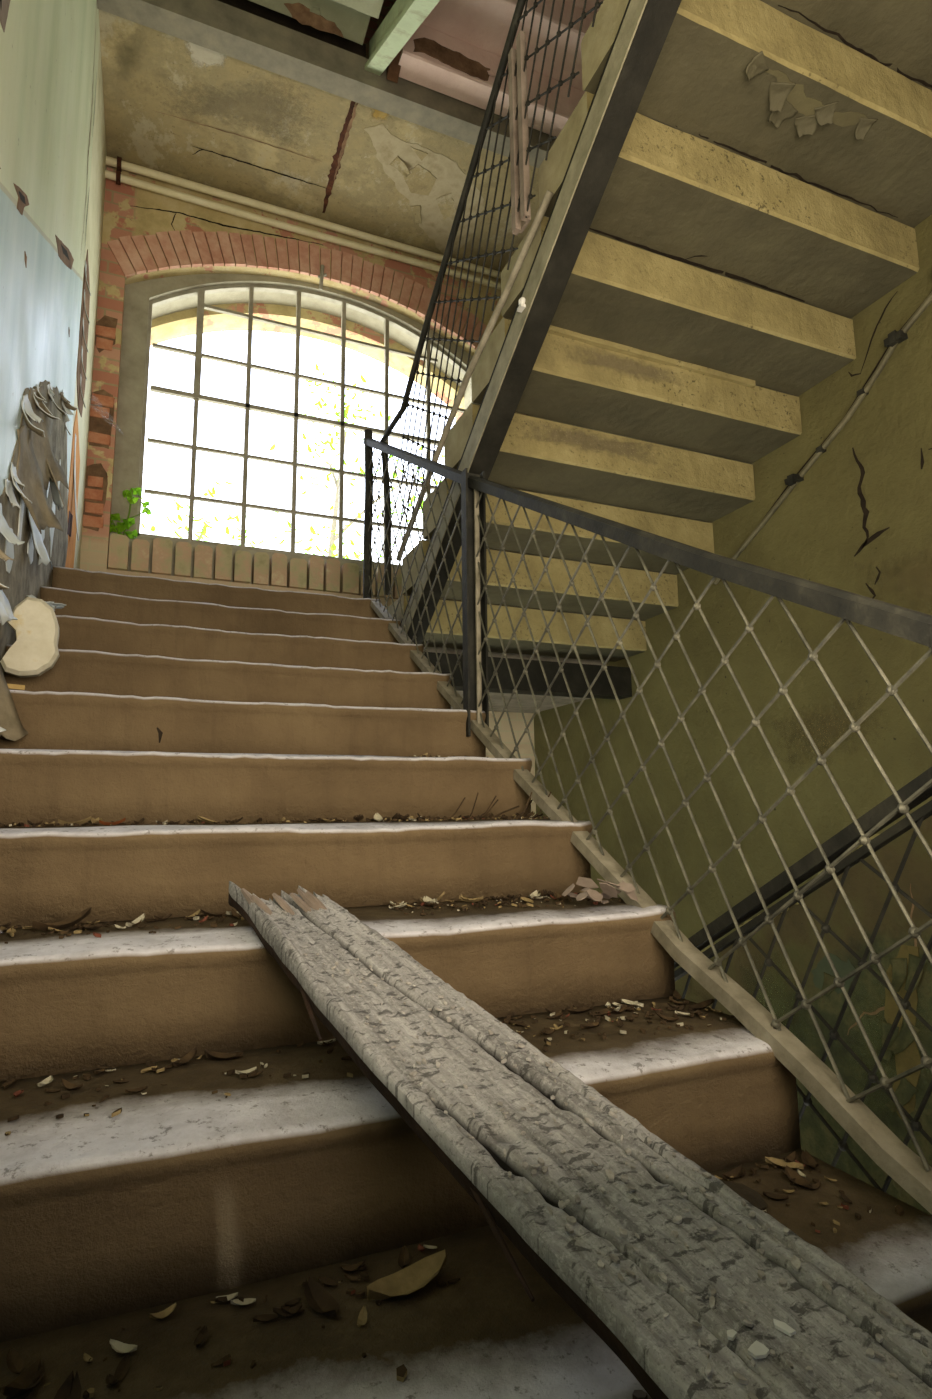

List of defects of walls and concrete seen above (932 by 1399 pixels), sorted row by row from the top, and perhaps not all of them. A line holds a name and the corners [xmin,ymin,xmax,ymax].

spalling [0,0,10,33]
spalling [284,3,344,38]
spalling [13,183,29,215]
peeling [364,124,484,253]
crack [920,448,932,469]
peeling [0,235,118,741]
crack [852,448,890,599]